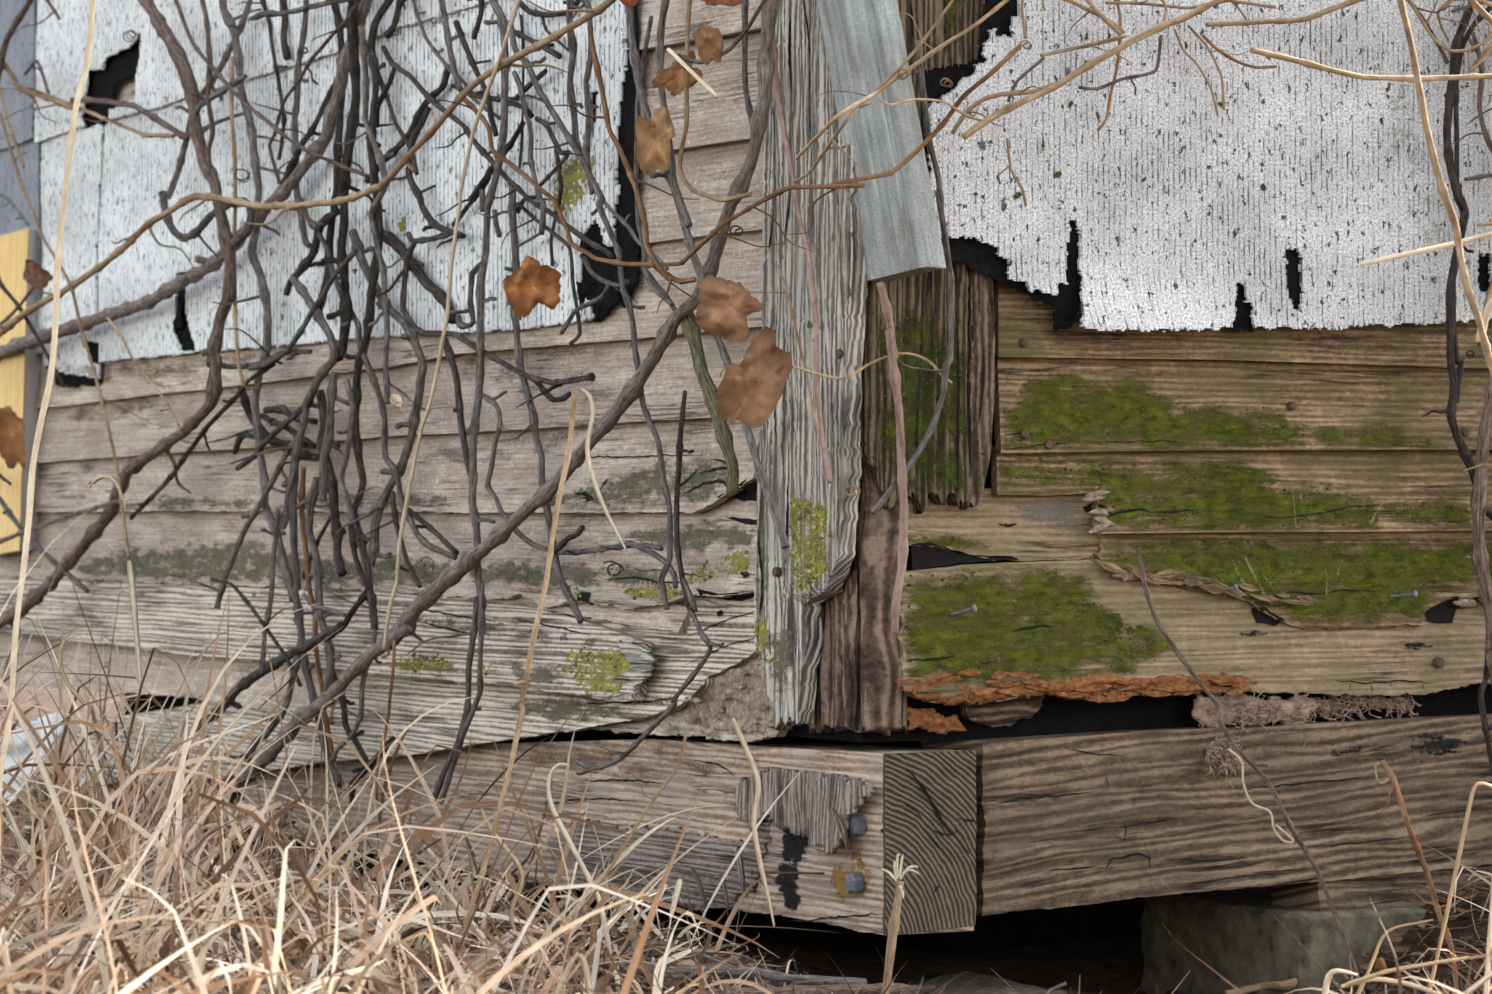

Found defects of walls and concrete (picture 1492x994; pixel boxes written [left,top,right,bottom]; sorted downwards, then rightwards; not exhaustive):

peeling [893,669,1258,703]
peeling [570,767,877,912]